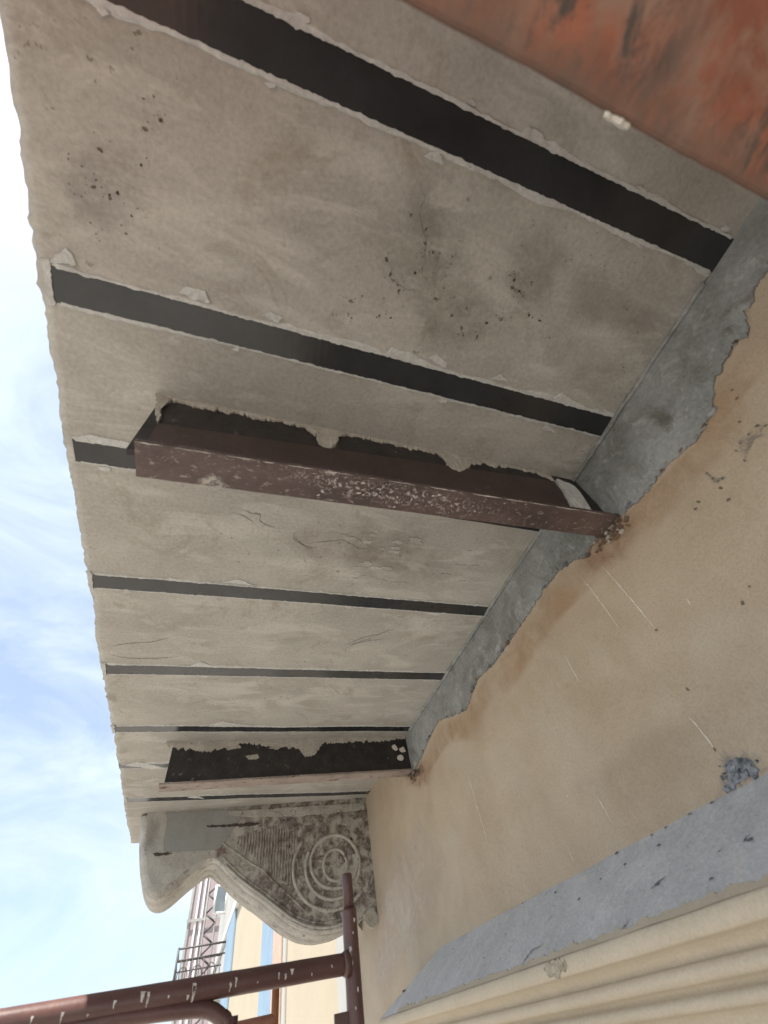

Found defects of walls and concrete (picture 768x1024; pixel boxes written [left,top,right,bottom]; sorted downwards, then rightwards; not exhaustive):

flaking render [603,111,631,130]
peeling [520,127,548,146]
peeling [385,348,448,369]
peeling [154,393,171,424]
peeling [554,392,599,413]
peeling [306,424,349,449]
peeling [446,453,479,472]
peeling [288,465,600,514]
crack [238,510,371,551]
peeling [224,744,259,760]
spalling [392,745,420,783]
flaking render [718,757,760,794]